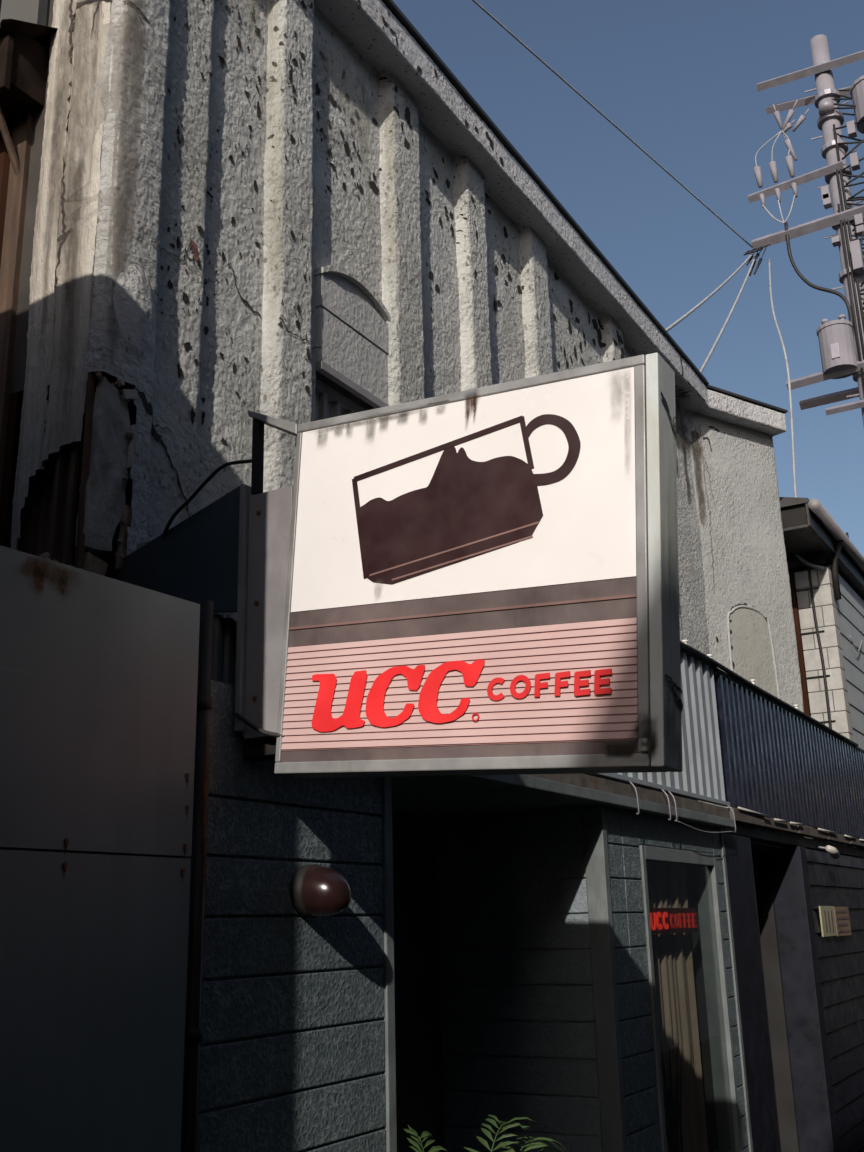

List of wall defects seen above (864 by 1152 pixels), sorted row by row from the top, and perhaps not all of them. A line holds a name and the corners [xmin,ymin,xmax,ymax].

flaking render [18,371,139,576]
crack [118,384,190,517]